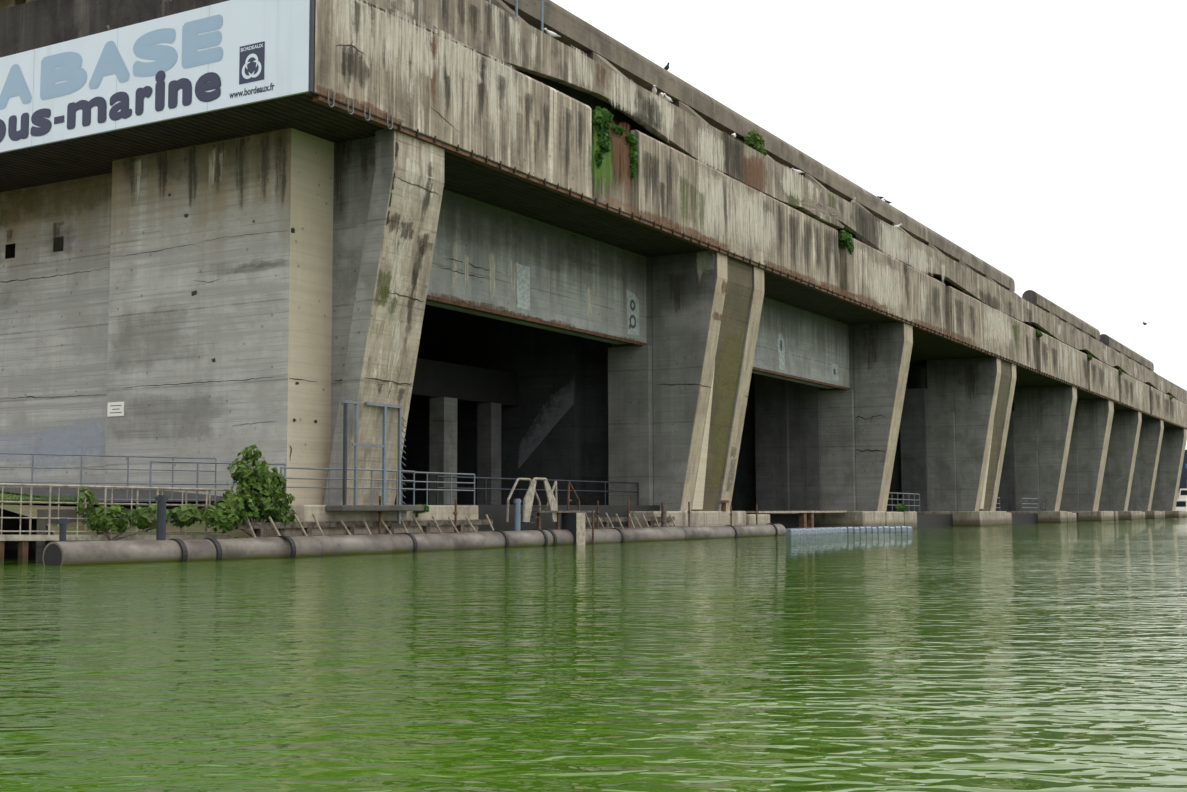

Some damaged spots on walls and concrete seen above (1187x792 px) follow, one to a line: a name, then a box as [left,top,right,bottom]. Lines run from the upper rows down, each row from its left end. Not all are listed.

water stain [189,140,245,203]
water stain [335,0,549,157]
water stain [573,46,592,90]
water stain [565,109,613,190]
water stain [608,73,674,139]
rust [607,122,726,250]
water stain [643,128,839,274]
water stain [852,204,1184,419]
water stain [711,377,737,487]